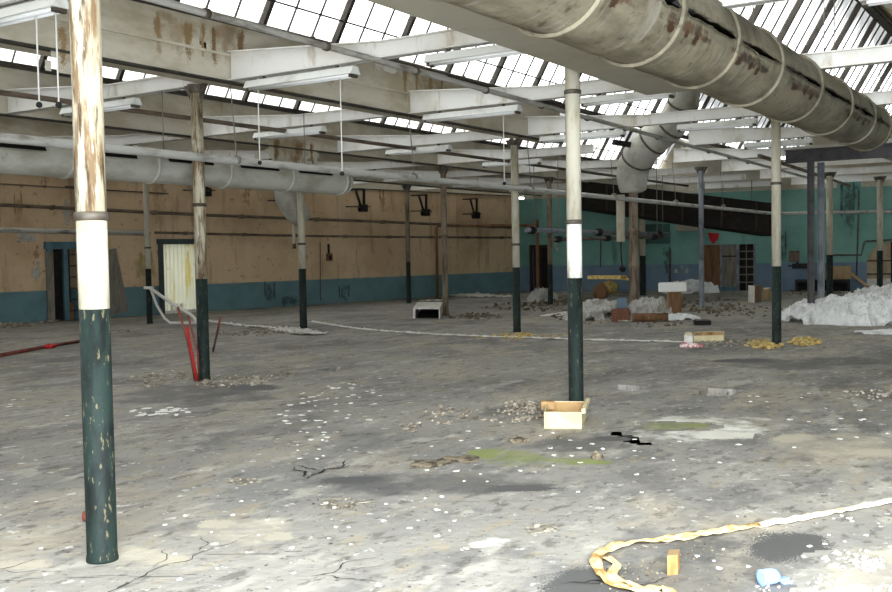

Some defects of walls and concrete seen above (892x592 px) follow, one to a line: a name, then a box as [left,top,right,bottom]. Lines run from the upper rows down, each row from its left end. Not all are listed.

corrosion [200,19,257,72]